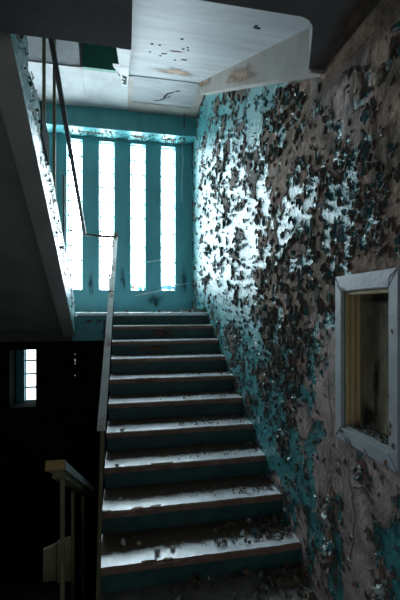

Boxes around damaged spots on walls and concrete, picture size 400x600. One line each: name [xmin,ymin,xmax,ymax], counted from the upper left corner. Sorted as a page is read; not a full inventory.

peeling [16,34,62,237]
peeling [191,5,400,600]